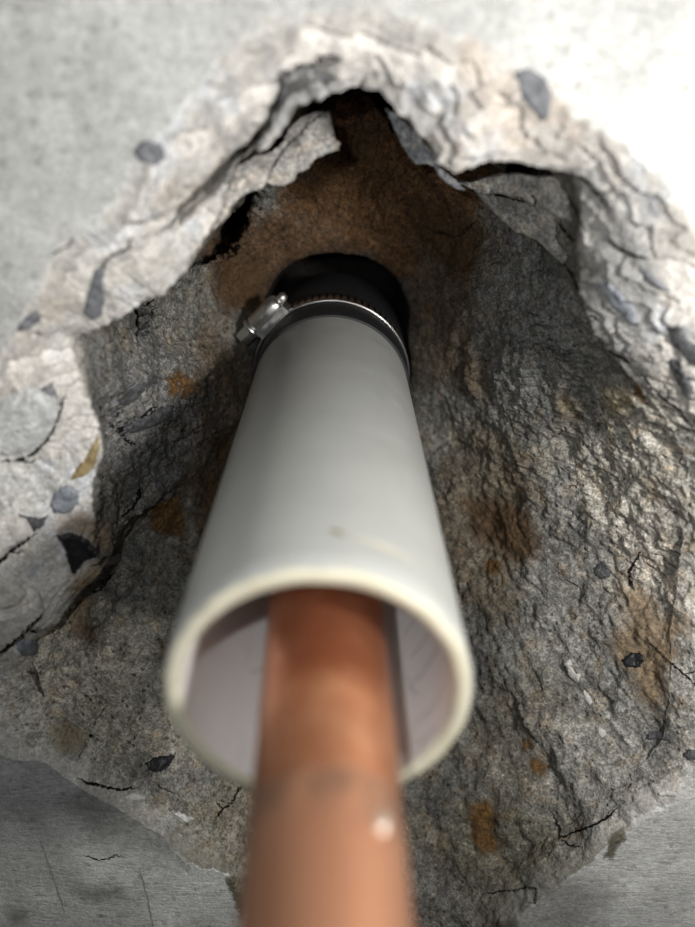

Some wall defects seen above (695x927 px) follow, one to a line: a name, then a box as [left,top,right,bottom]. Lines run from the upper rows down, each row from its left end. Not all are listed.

spalling [0,3,695,673]
rust [167,371,195,397]
rust [468,498,541,560]
crack [627,552,641,591]
rust [617,590,685,702]
crack [648,640,695,685]
crack [77,777,135,791]
spalling [0,638,246,879]
crack [215,786,243,820]
rust [469,802,500,854]
spalling [411,665,695,927]
crack [554,808,617,848]